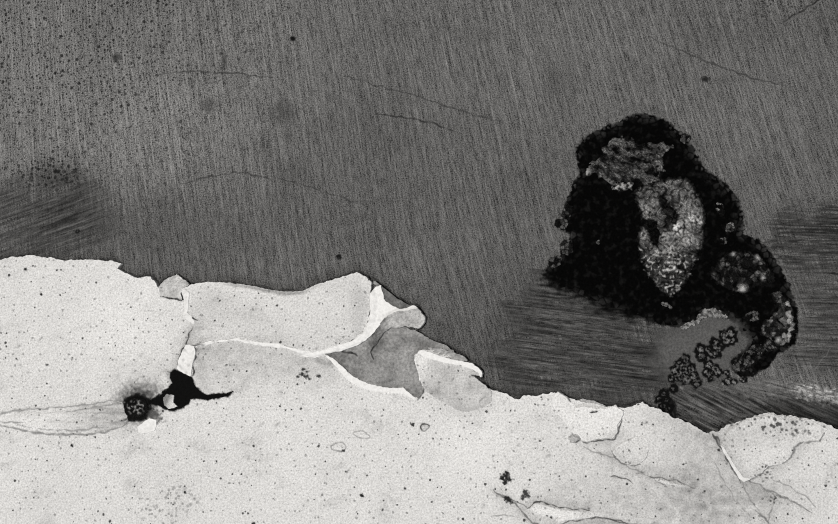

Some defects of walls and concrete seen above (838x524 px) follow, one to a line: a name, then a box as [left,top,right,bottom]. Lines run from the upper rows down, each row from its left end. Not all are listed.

rust [543,106,801,416]
peeling [158,272,492,412]
rust [123,387,162,433]
peeling [552,392,649,466]
crack [751,482,810,521]